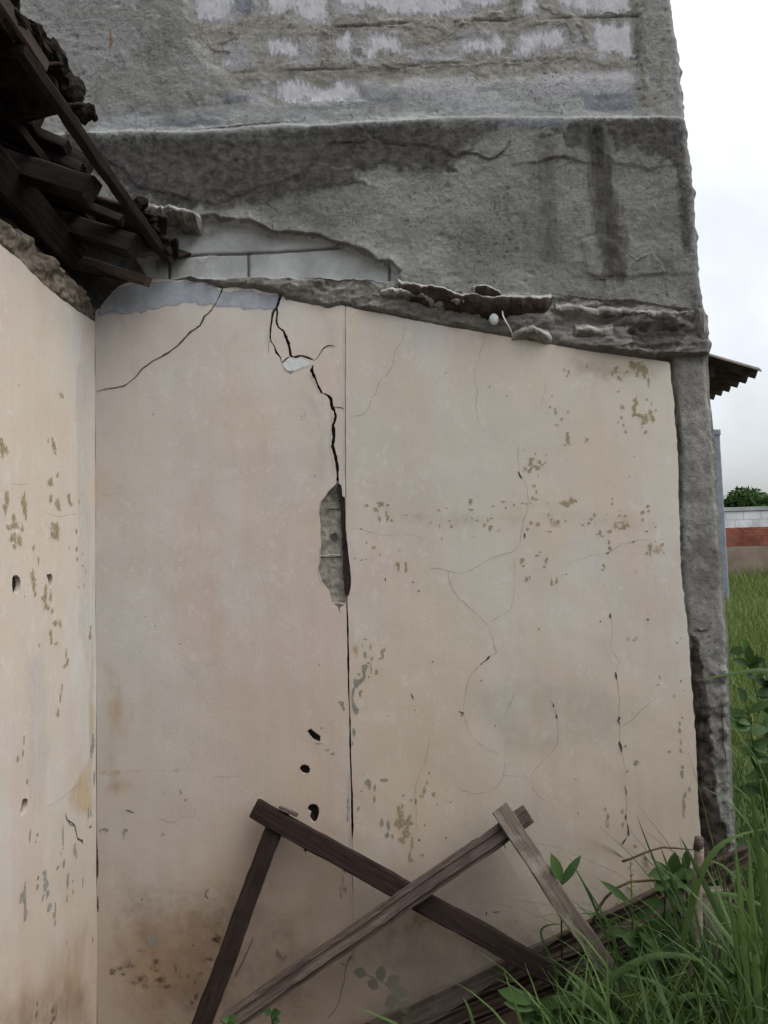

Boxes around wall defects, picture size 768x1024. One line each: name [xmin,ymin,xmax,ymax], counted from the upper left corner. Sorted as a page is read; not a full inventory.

water stain [88,92,693,280]
crack [339,127,511,170]
crack [98,287,223,391]
flaking render [135,215,711,433]
crack [267,277,380,544]
peeling [3,491,69,668]
peeling [48,473,80,538]
flaking render [318,481,362,612]
peeling [469,450,577,537]
peeling [581,498,629,550]
crack [346,605,354,849]
peeling [20,830,84,926]